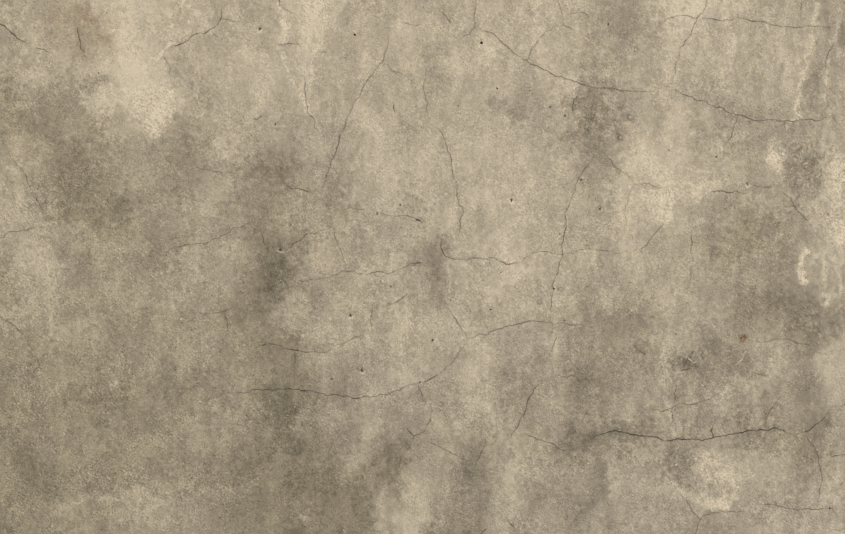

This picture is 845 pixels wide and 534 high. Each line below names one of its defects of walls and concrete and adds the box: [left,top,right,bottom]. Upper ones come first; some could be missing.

leakage [764,137,787,181]
leakage [796,140,845,307]
crack [599,410,785,441]